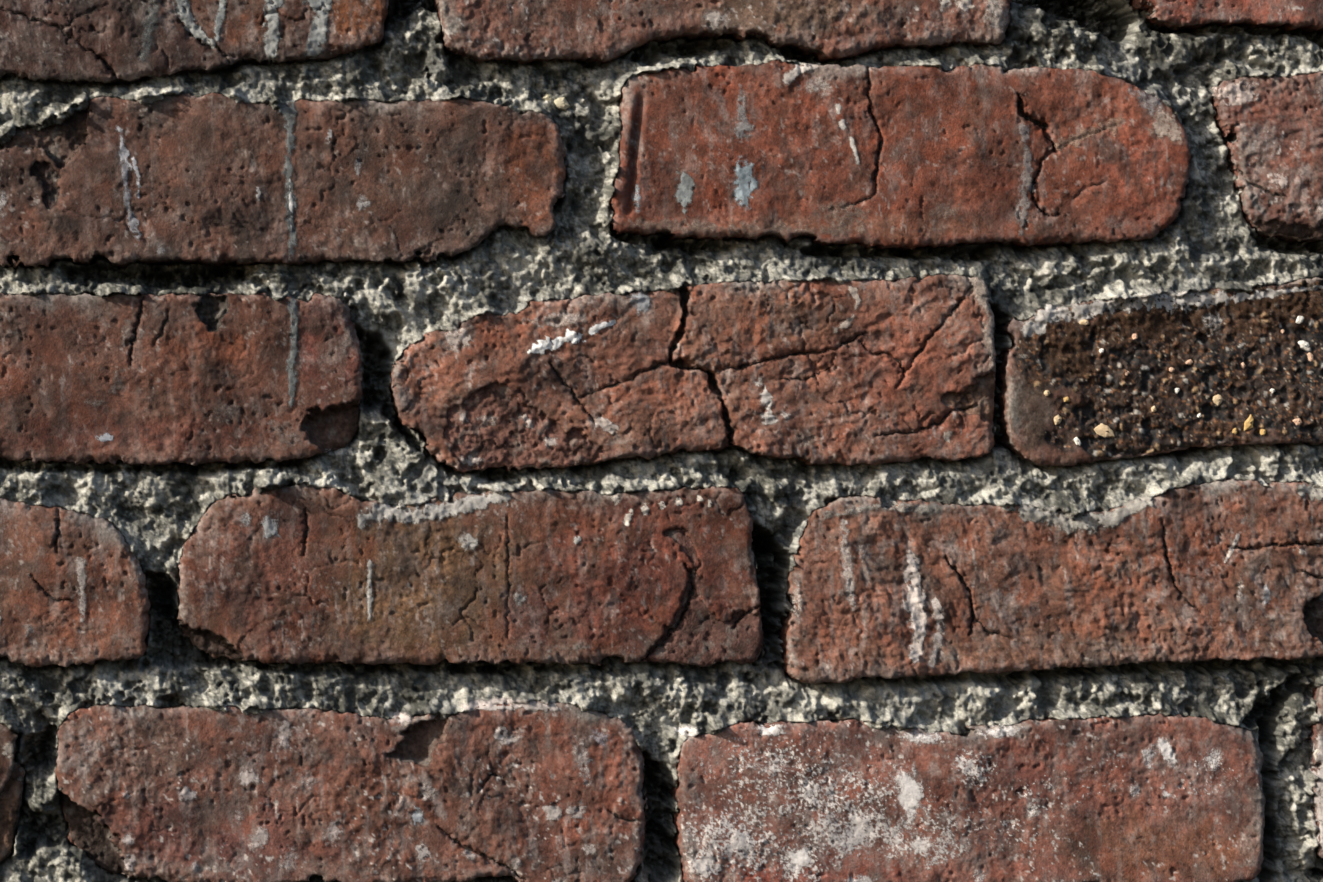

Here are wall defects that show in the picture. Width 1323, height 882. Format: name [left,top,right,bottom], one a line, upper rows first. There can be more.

crack [5,5,118,83]
crack [190,33,229,56]
crack [849,81,883,206]
crack [1017,99,1055,217]
crack [553,290,967,445]
spalling [1013,280,1323,461]
crack [642,566,700,660]
efflorescence [674,725,698,736]
efflorescence [683,723,1139,882]
efflorescence [1142,737,1177,768]
efflorescence [1163,750,1224,797]